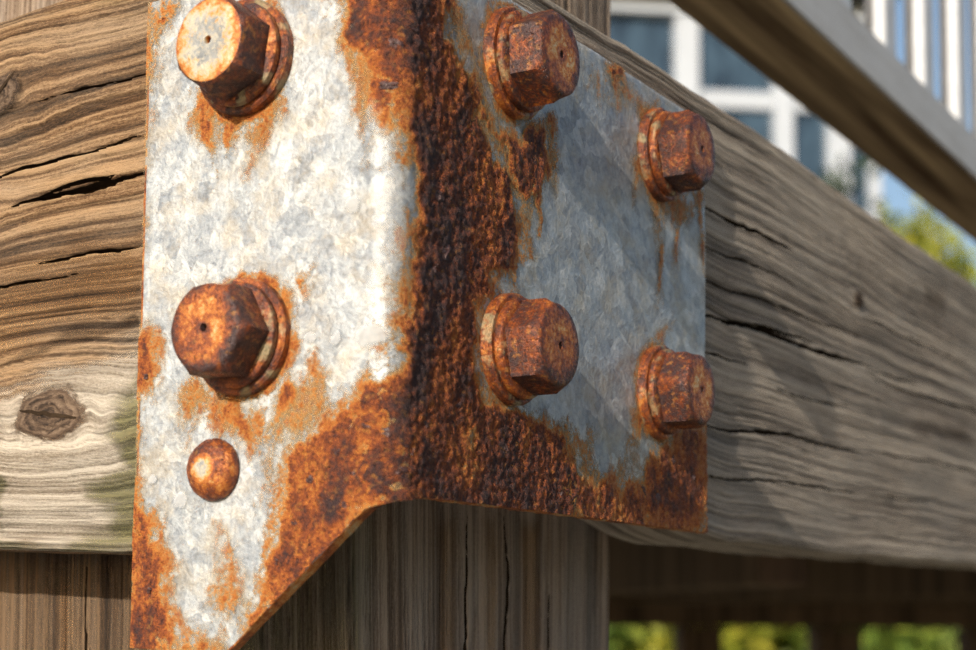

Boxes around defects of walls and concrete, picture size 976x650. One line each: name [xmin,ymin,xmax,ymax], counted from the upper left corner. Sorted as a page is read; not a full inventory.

crack [0,134,145,179]
crack [11,171,145,208]
crack [705,207,799,254]
crack [705,246,795,286]
rust [130,0,708,650]
crack [705,281,976,414]
crack [706,425,976,475]
crack [709,475,928,502]
crack [461,515,469,650]
crack [502,516,510,650]
crack [544,596,552,650]